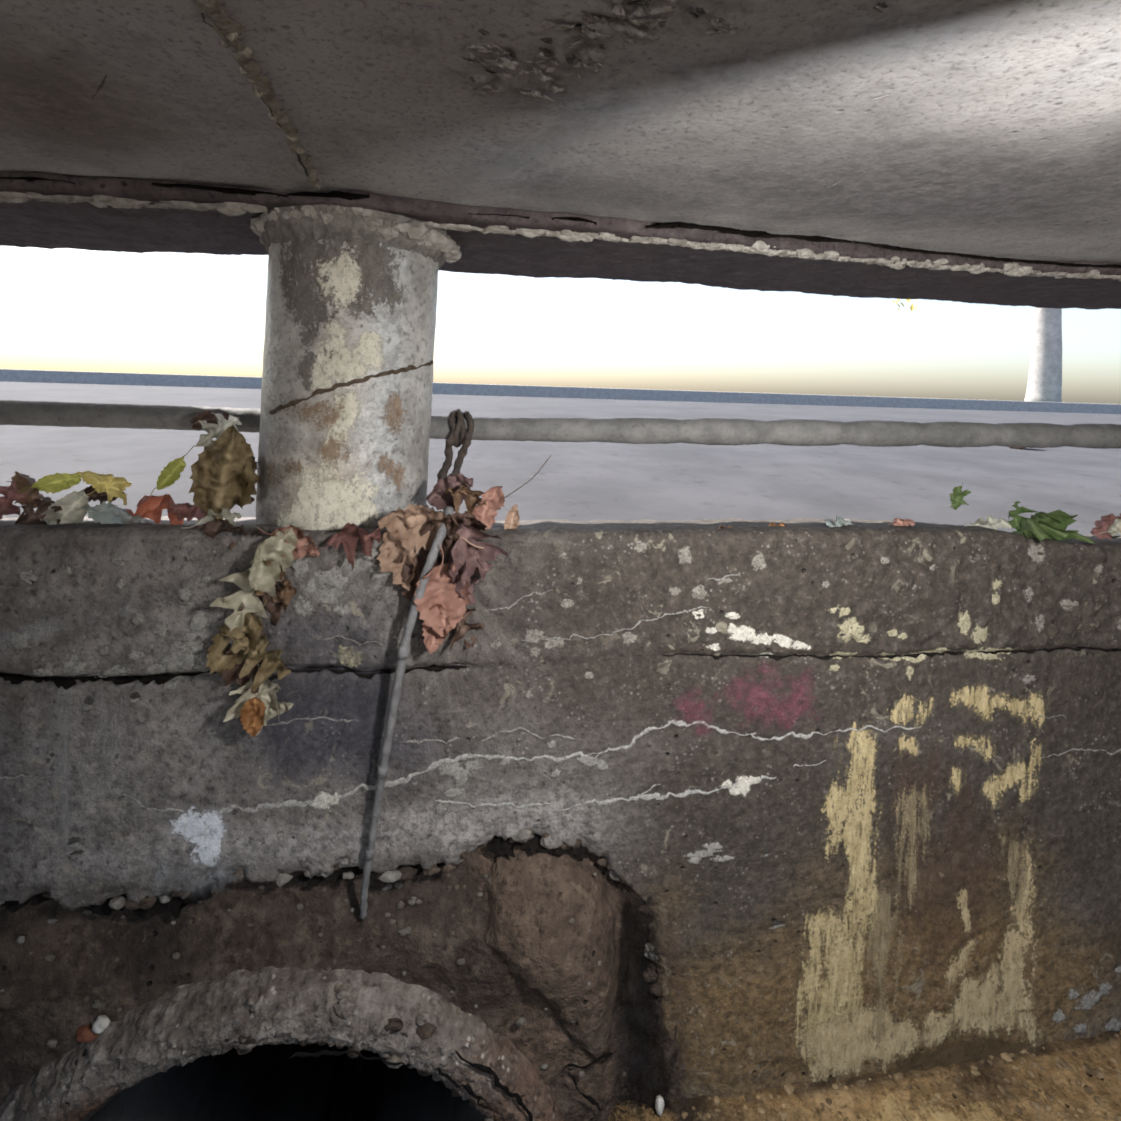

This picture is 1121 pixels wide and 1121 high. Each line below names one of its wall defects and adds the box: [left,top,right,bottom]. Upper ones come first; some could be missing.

spalling [463,0,739,102]
crack [646,222,1121,268]
crack [269,360,433,415]
crack [287,633,467,679]
crack [662,646,1121,661]
crack [116,720,919,818]
spalling [259,858,354,889]
spalling [374,851,472,937]
crack [289,834,588,887]
spalling [509,829,582,850]
spalling [384,1011,437,1041]
damp [608,902,678,1121]